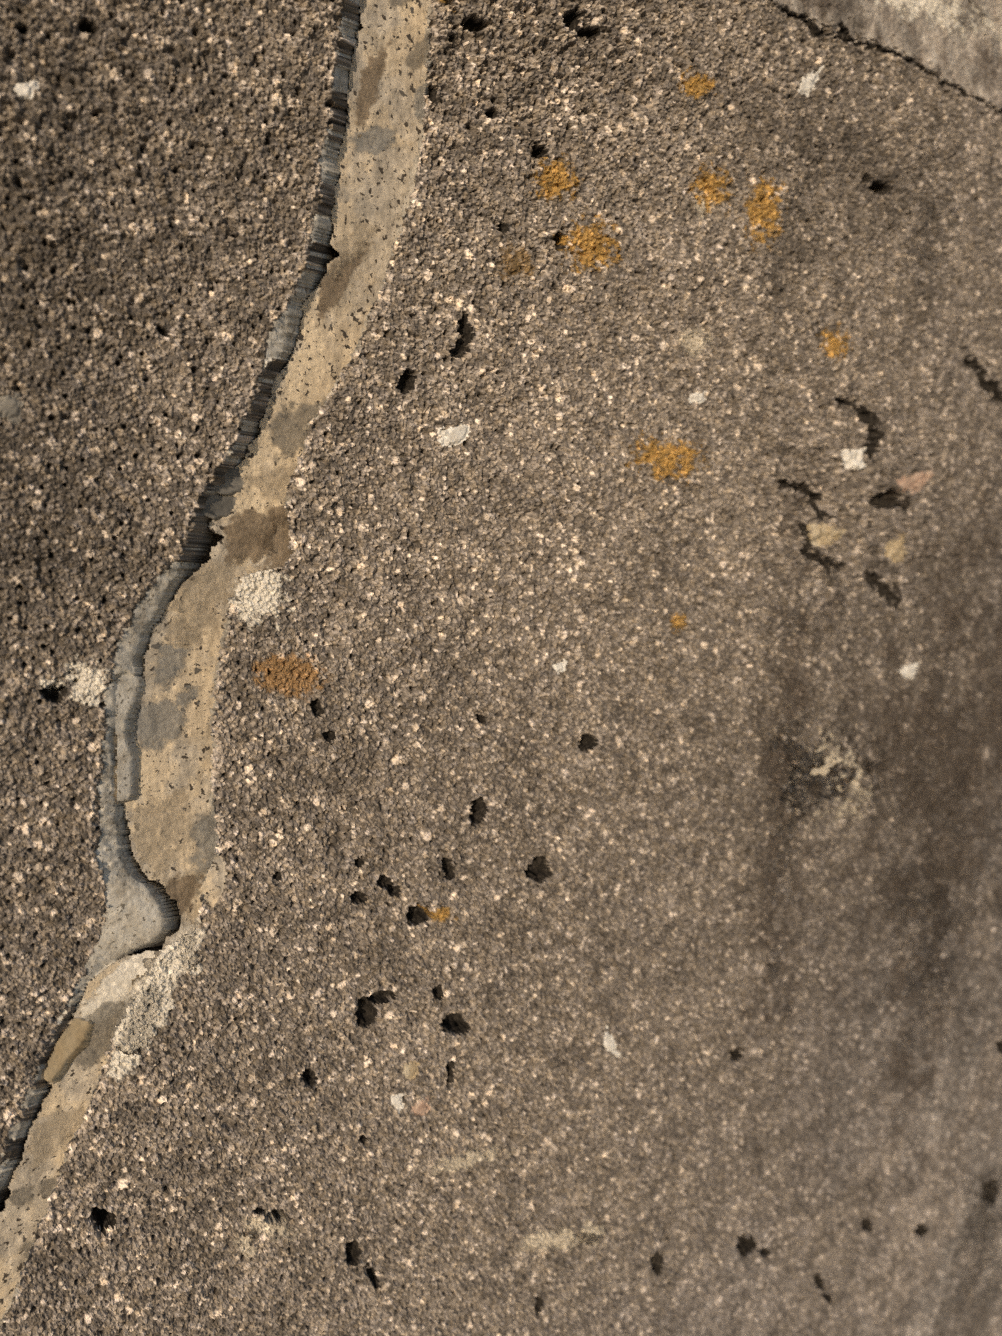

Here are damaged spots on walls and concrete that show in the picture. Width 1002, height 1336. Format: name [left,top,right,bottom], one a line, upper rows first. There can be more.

crack [0,0,433,1328]
crack [763,0,1002,114]